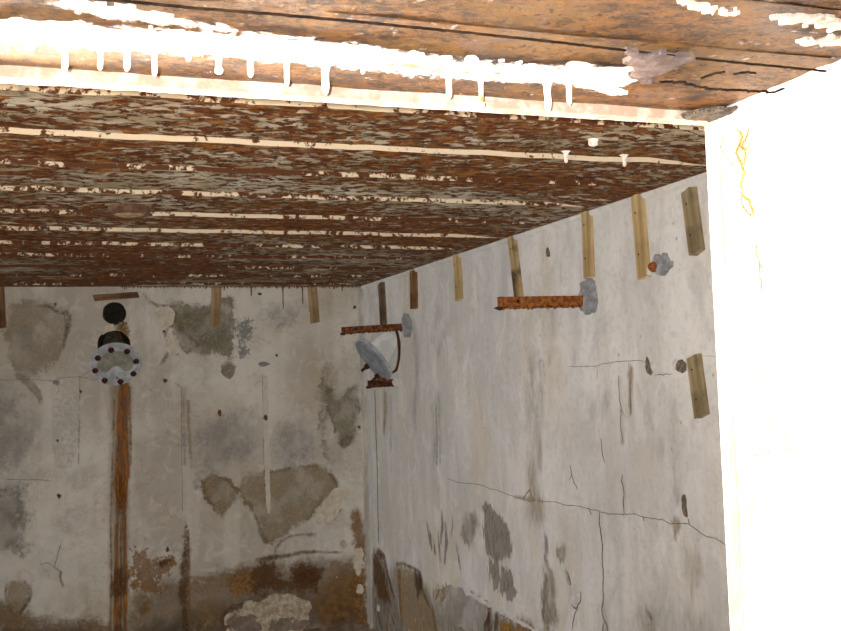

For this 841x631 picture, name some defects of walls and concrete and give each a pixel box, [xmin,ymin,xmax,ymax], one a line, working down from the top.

water stain [0,0,638,96]
peeling [623,47,696,85]
rust [719,126,755,219]
crack [568,360,644,441]
rust [0,383,437,631]
crack [450,467,725,631]